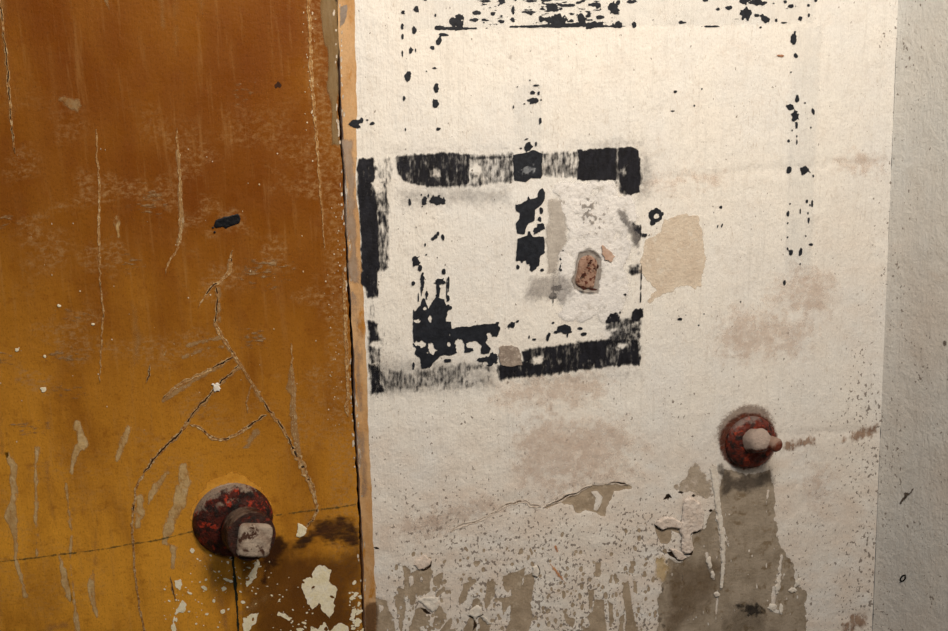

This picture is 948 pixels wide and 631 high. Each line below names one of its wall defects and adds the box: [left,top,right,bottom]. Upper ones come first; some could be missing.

flaking render [639,214,706,303]
crack [130,250,319,631]
rust [720,413,815,470]
peeling [171,579,225,631]
peeling [242,613,259,631]
peeling [246,561,260,587]
peeling [296,523,307,537]
peeling [277,565,364,631]
crack [450,499,541,532]
spalling [376,463,807,631]